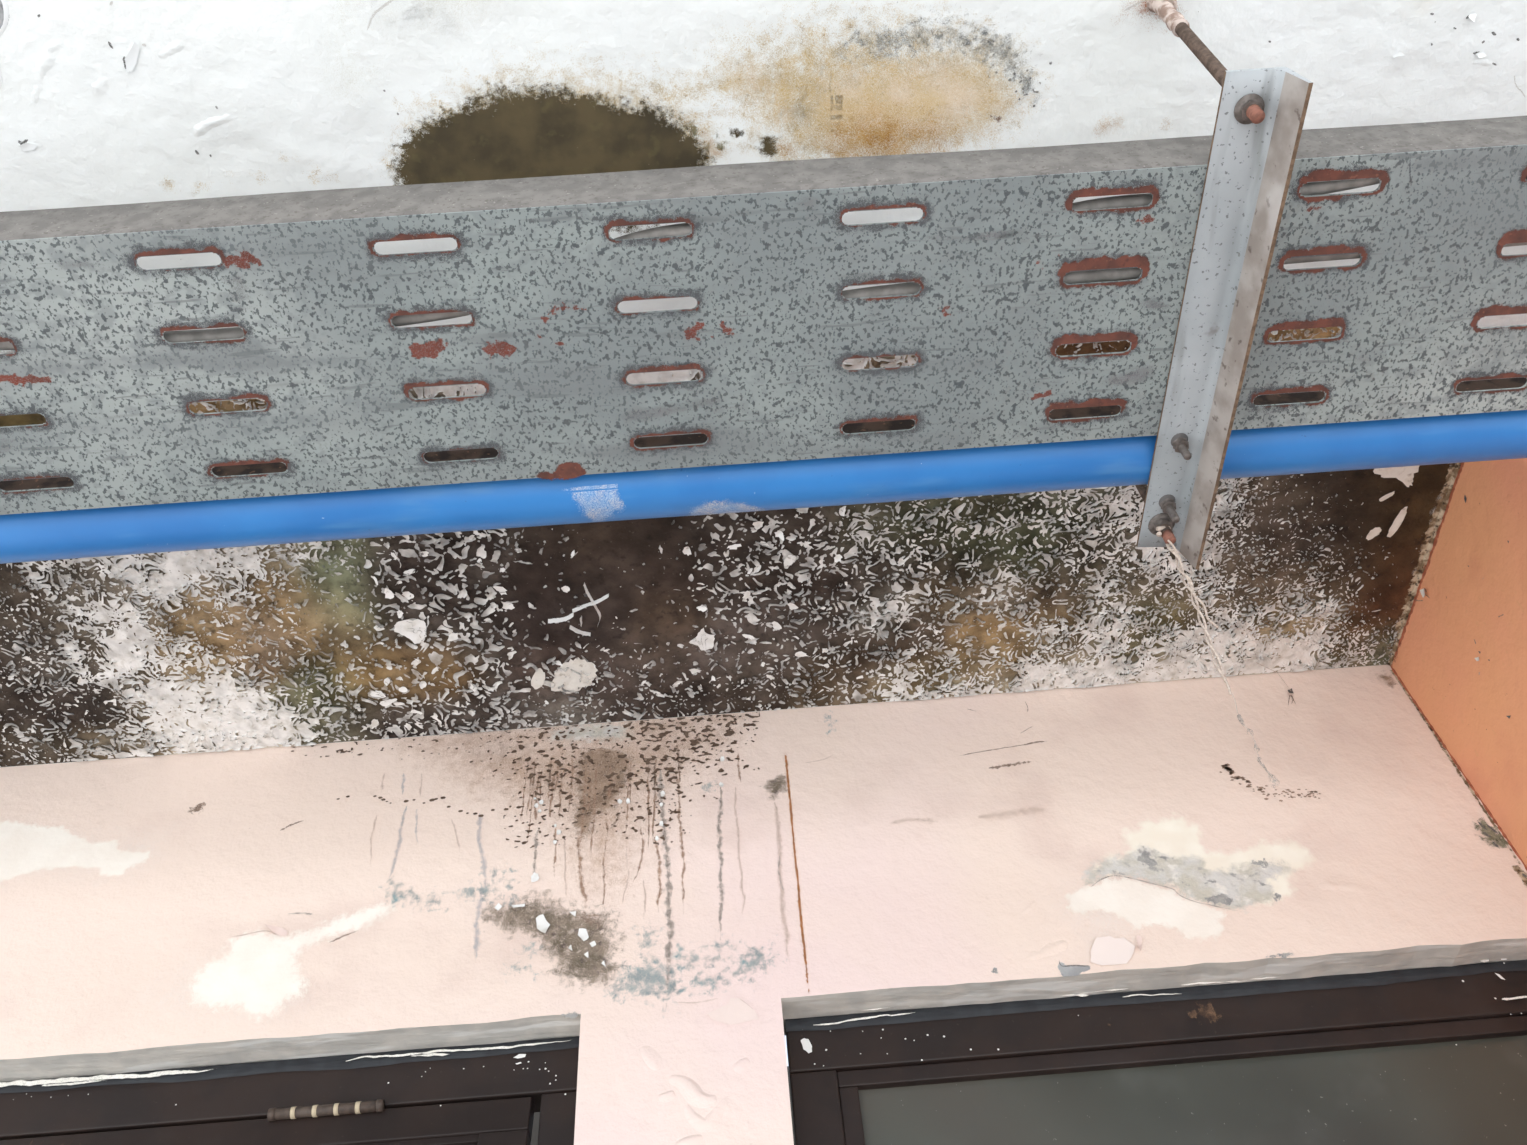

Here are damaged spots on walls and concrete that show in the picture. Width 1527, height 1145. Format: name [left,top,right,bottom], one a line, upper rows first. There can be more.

peeling [0,0,10,36]
water stain [312,0,1061,186]
water stain [0,413,46,427]
water stain [189,398,267,414]
water stain [409,384,486,399]
water stain [626,369,703,384]
water stain [842,355,918,370]
water stain [1056,341,1130,356]
water stain [0,463,1452,1014]
peeling [0,809,185,894]
corrosion [784,753,810,992]
peeling [1042,812,1318,977]